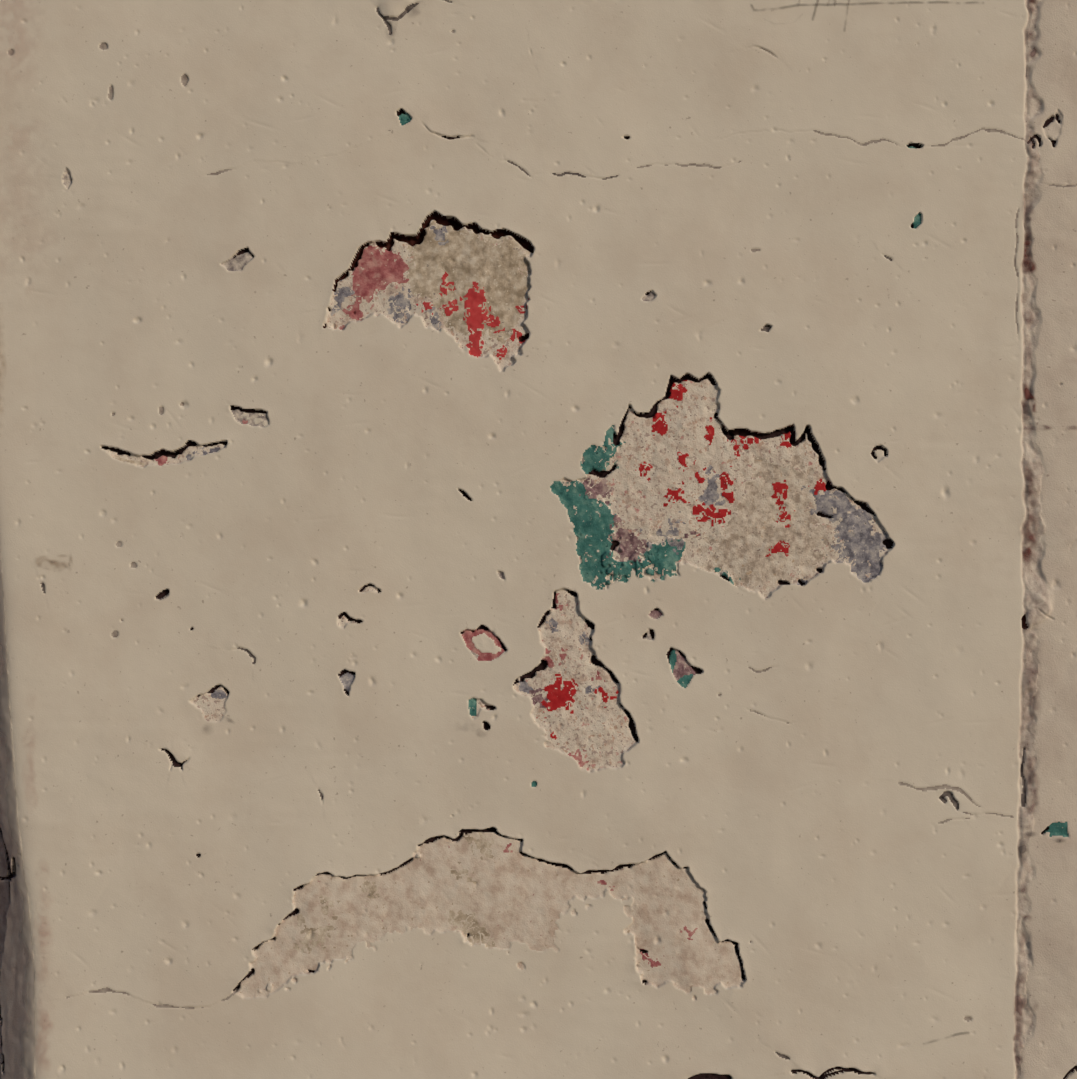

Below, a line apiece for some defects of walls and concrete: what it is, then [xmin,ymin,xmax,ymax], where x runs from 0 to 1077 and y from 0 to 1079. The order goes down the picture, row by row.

crack [813,130,897,146]
crack [931,128,1041,149]
crack [207,168,232,176]
crack [507,160,741,180]
peeling [323,211,534,372]
spalling [102,440,228,467]
peeling [550,373,894,599]
peeling [460,625,507,661]
peeling [513,588,638,772]
peeling [666,648,703,688]
peeling [233,827,751,1001]
crack [1063,1066,1077,1079]